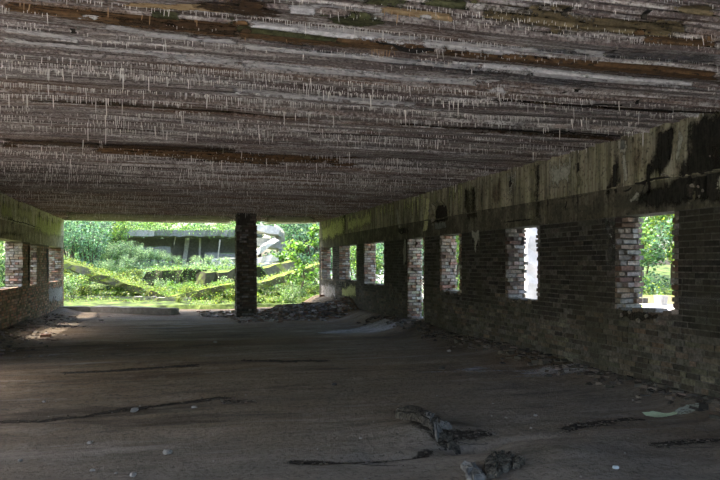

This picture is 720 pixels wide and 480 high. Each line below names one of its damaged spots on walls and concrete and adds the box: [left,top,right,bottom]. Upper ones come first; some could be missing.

leakage [1,0,720,209]
leakage [449,187,483,218]
crack [62,364,200,375]
crack [0,396,257,424]